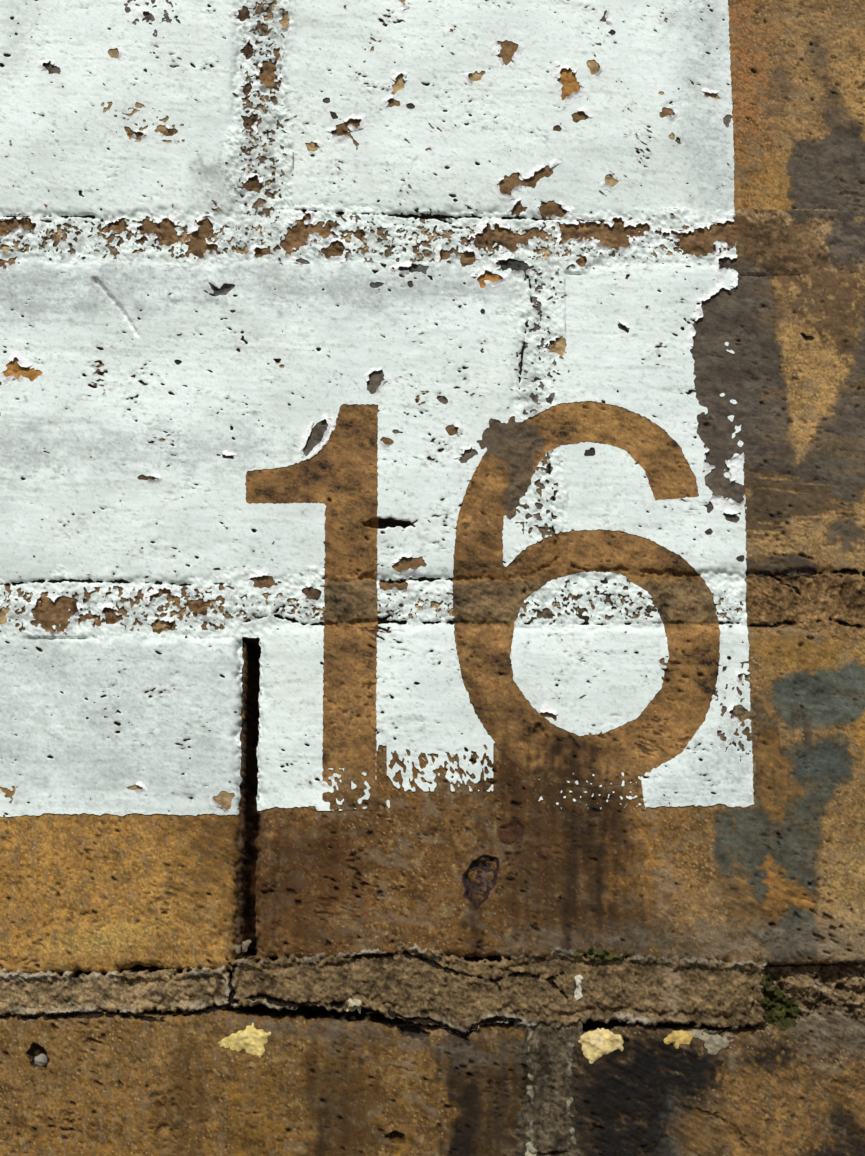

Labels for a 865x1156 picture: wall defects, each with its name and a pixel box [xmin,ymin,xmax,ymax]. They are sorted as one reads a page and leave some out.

peeling [124,0,181,38]
peeling [101,102,185,143]
peeling [231,0,762,415]
peeling [0,208,222,272]
spalling [208,282,235,297]
peeling [698,421,763,523]
peeling [0,572,229,637]
peeling [379,549,427,596]
crack [700,568,865,629]
crack [764,960,865,968]
crack [0,950,568,1046]
damp [437,1025,543,1156]